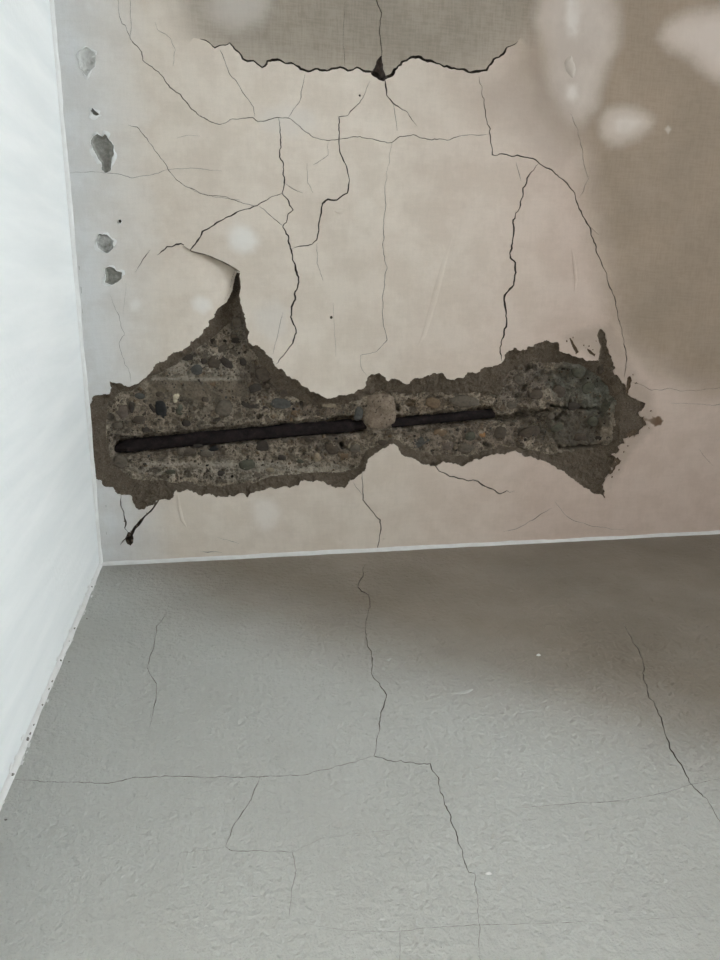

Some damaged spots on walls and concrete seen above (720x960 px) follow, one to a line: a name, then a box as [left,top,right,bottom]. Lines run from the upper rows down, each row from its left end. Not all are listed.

peeling [77,46,97,79]
peeling [89,130,117,173]
peeling [94,232,117,253]
crack [73,0,719,405]
spalling [90,247,652,510]
crack [432,462,513,494]
crack [80,480,591,958]
crack [520,624,720,821]